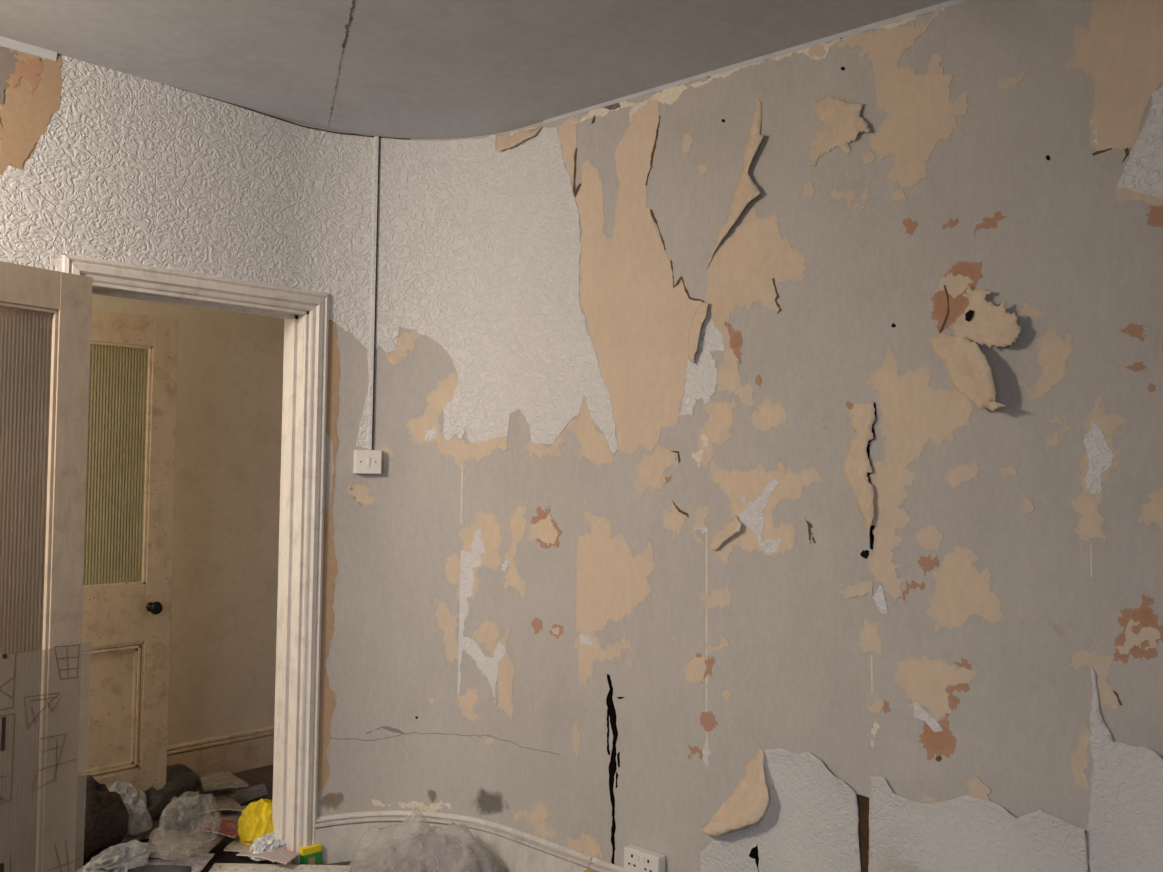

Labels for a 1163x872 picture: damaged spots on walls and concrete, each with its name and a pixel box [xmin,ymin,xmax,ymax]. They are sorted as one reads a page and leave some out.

peeling [0,47,26,139]
peeling [706,98,763,269]
peeling [570,16,917,124]
peeling [808,96,870,167]
peeling [927,261,1022,411]
peeling [844,401,875,544]
flaking render [899,555,939,602]
flaking render [1113,595,1163,664]
crack [330,726,559,755]
crack [606,674,624,864]
peeling [699,747,769,836]
flaking render [919,656,971,762]